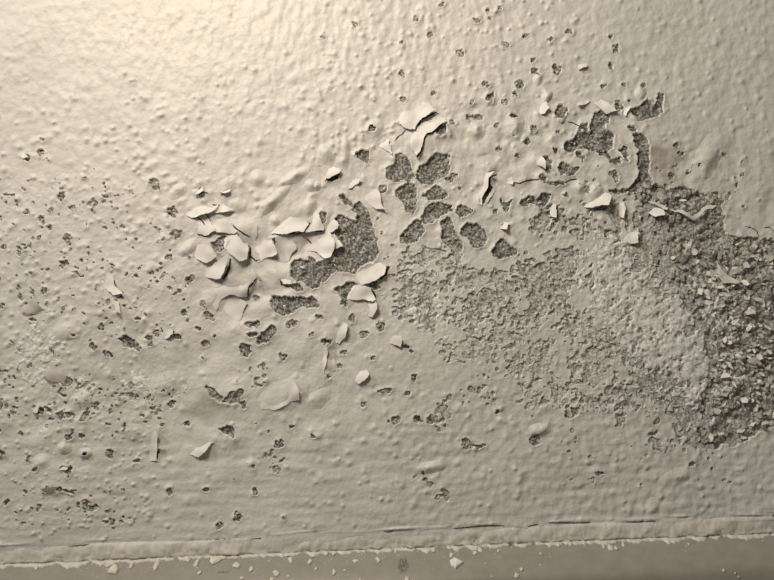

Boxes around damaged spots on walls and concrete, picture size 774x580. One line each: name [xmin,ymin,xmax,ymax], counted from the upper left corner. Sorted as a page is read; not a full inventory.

spalling [482,80,524,118]
peeling [17,169,182,352]
flaking render [125,91,774,475]
spalling [40,486,135,530]